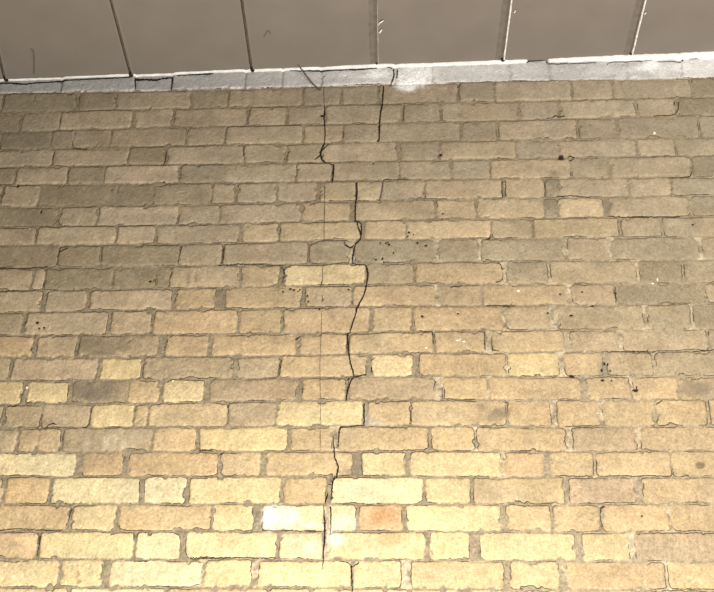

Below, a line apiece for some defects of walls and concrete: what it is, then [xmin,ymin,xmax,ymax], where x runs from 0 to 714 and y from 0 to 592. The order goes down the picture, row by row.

crack [0,73,214,90]
crack [290,67,398,142]
crack [315,99,335,232]
crack [318,265,326,356]
crack [320,182,369,592]